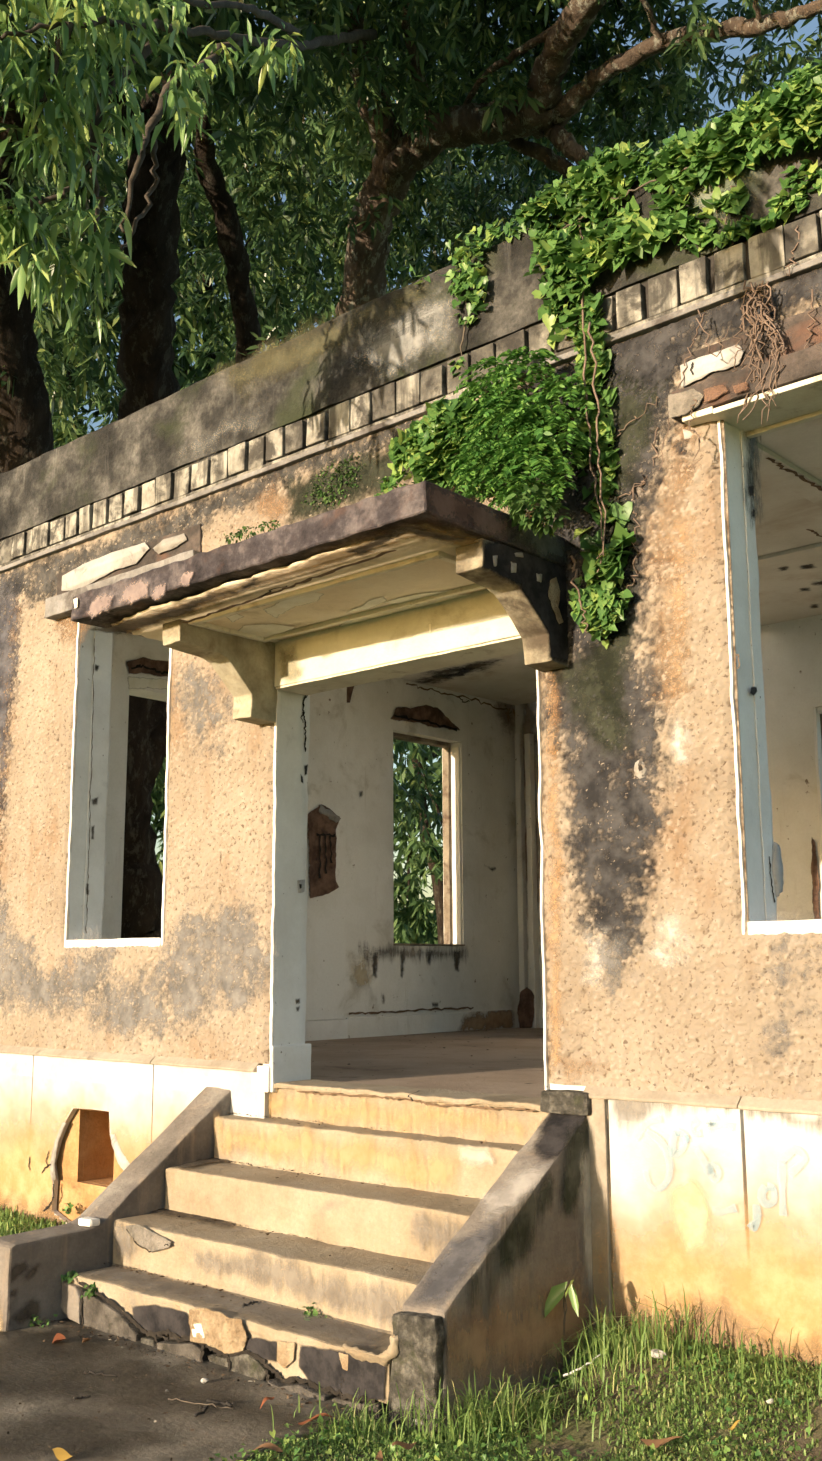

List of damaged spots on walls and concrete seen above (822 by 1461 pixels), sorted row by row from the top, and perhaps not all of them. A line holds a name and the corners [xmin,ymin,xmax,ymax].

flaking render [668,344,748,418]
flaking render [61,533,193,617]
flaking render [127,657,169,689]
damp [0,419,416,821]
damp [416,268,822,994]
flaking render [297,804,341,898]
damp [0,900,271,1039]
damp [360,944,466,977]
damp [614,1100,671,1119]
damp [96,1113,822,1400]
flaking render [188,1308,247,1354]
spalling [342,1334,399,1366]